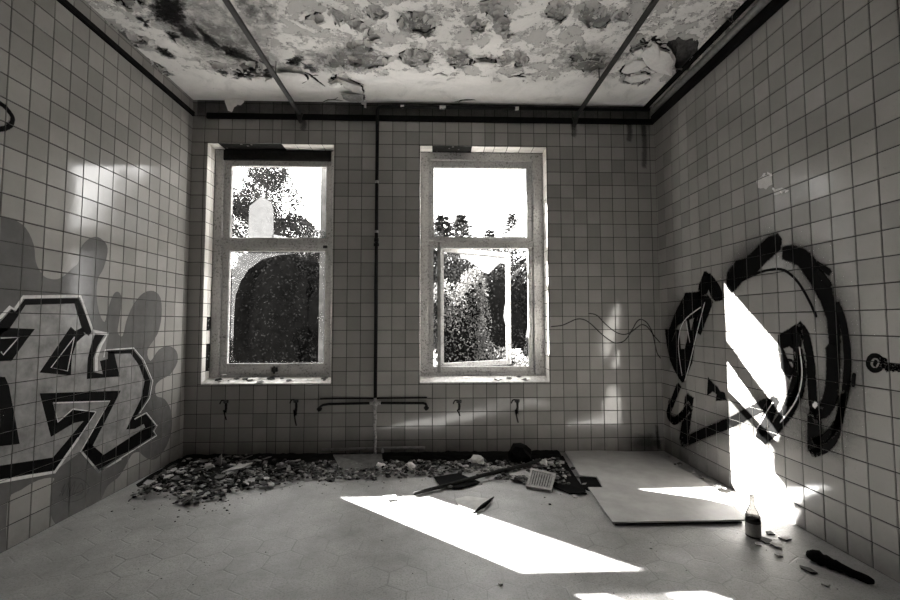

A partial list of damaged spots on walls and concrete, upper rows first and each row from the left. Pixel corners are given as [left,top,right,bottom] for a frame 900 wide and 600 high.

peeling [116,0,143,13]
peeling [464,0,515,39]
peeling [544,0,630,29]
peeling [105,18,175,76]
peeling [211,60,279,81]
peeling [305,3,436,108]
peeling [445,47,474,70]
peeling [495,51,529,68]
peeling [569,51,612,75]
spalling [618,32,700,86]
peeling [224,99,244,112]
spalling [756,172,788,195]